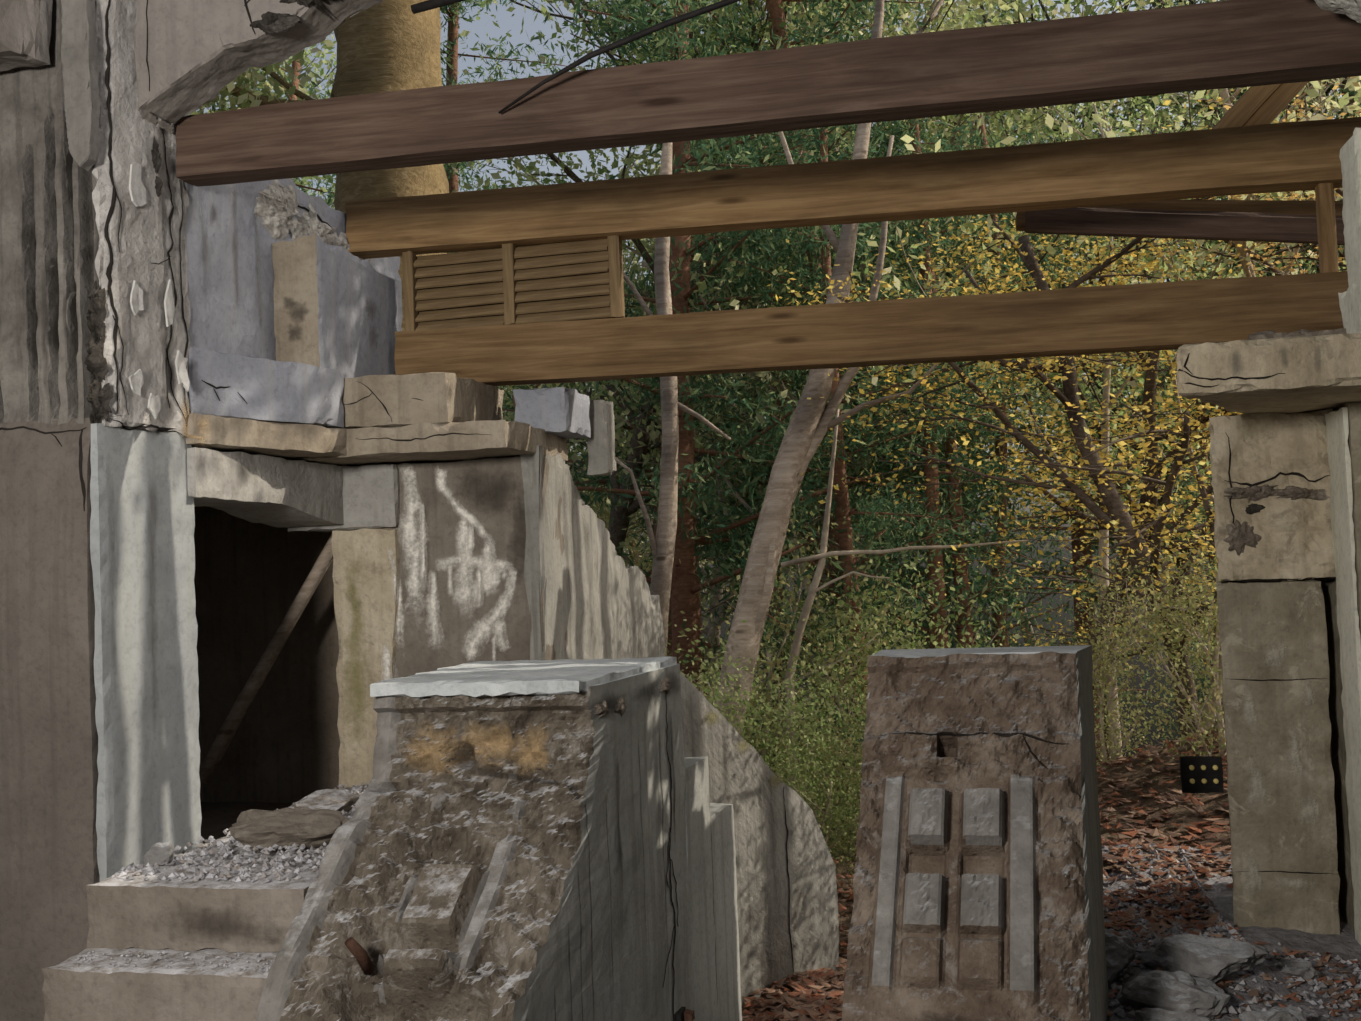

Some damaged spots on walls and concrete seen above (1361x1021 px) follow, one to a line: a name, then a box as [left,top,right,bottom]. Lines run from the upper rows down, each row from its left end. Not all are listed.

spalling [250,0,344,35]
peeling [129,136,163,207]
crack [0,0,247,511]
spalling [254,180,371,261]
peeling [130,280,144,315]
peeling [164,279,175,327]
spalling [84,280,114,424]
peeling [128,369,161,419]
peeling [175,350,190,391]
crack [1177,354,1285,387]
crack [1224,432,1330,524]
crack [663,697,678,1021]